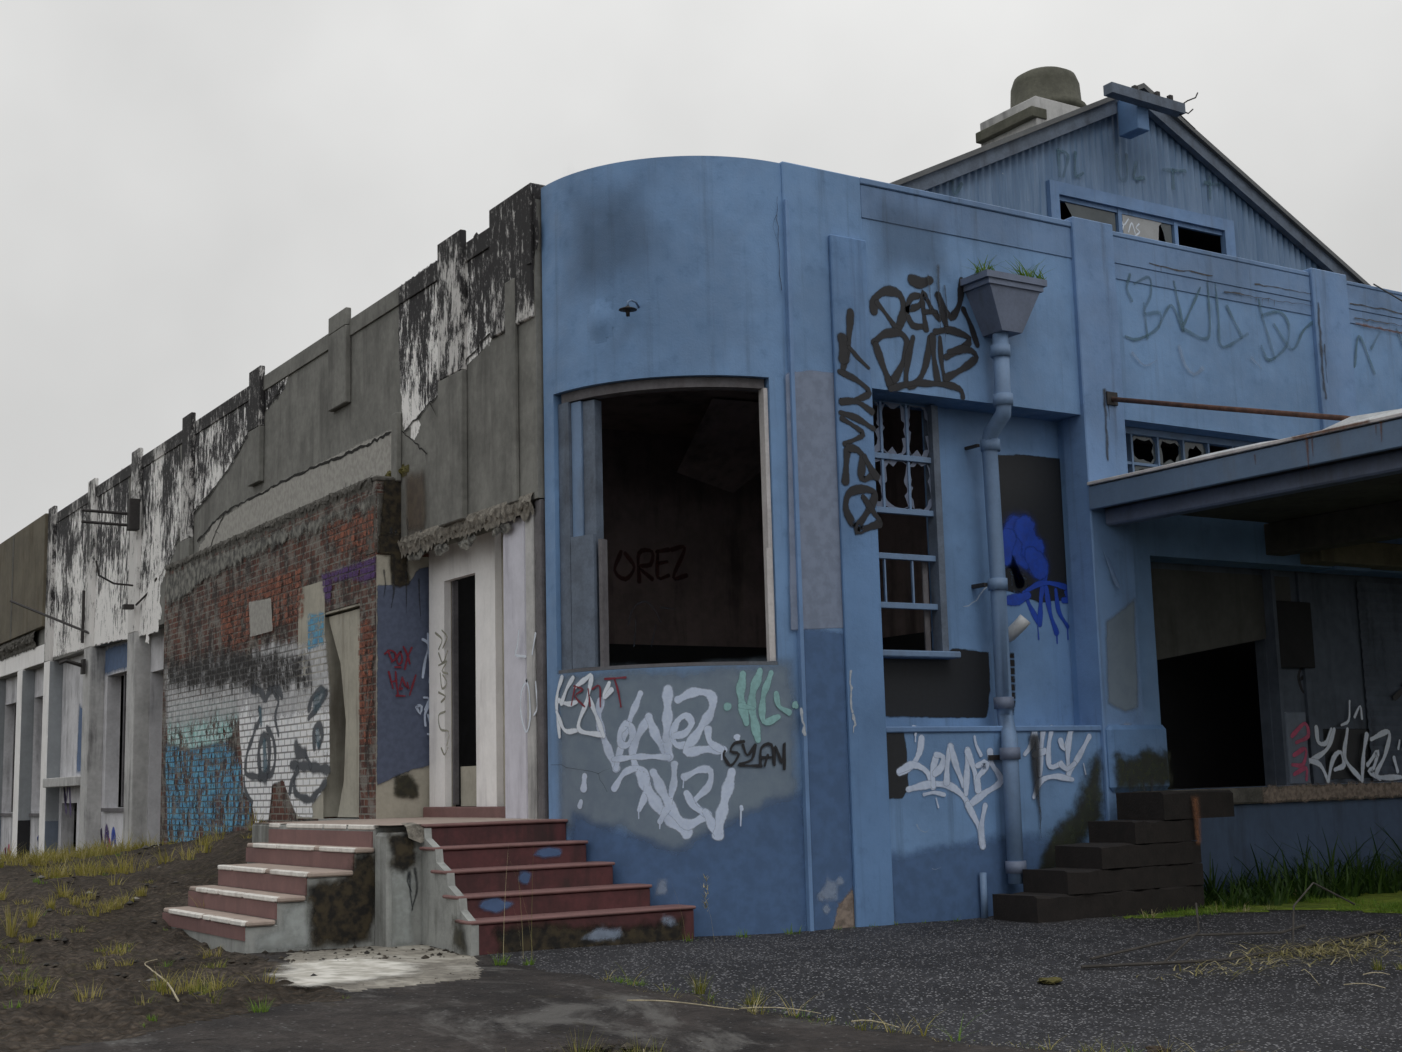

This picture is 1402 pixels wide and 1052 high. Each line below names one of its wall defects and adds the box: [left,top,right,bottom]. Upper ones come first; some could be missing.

peeling [466,232,491,365]
flaking render [53,261,439,657]
spalling [398,492,534,561]
spalling [0,631,36,661]
flaking render [358,620,374,743]